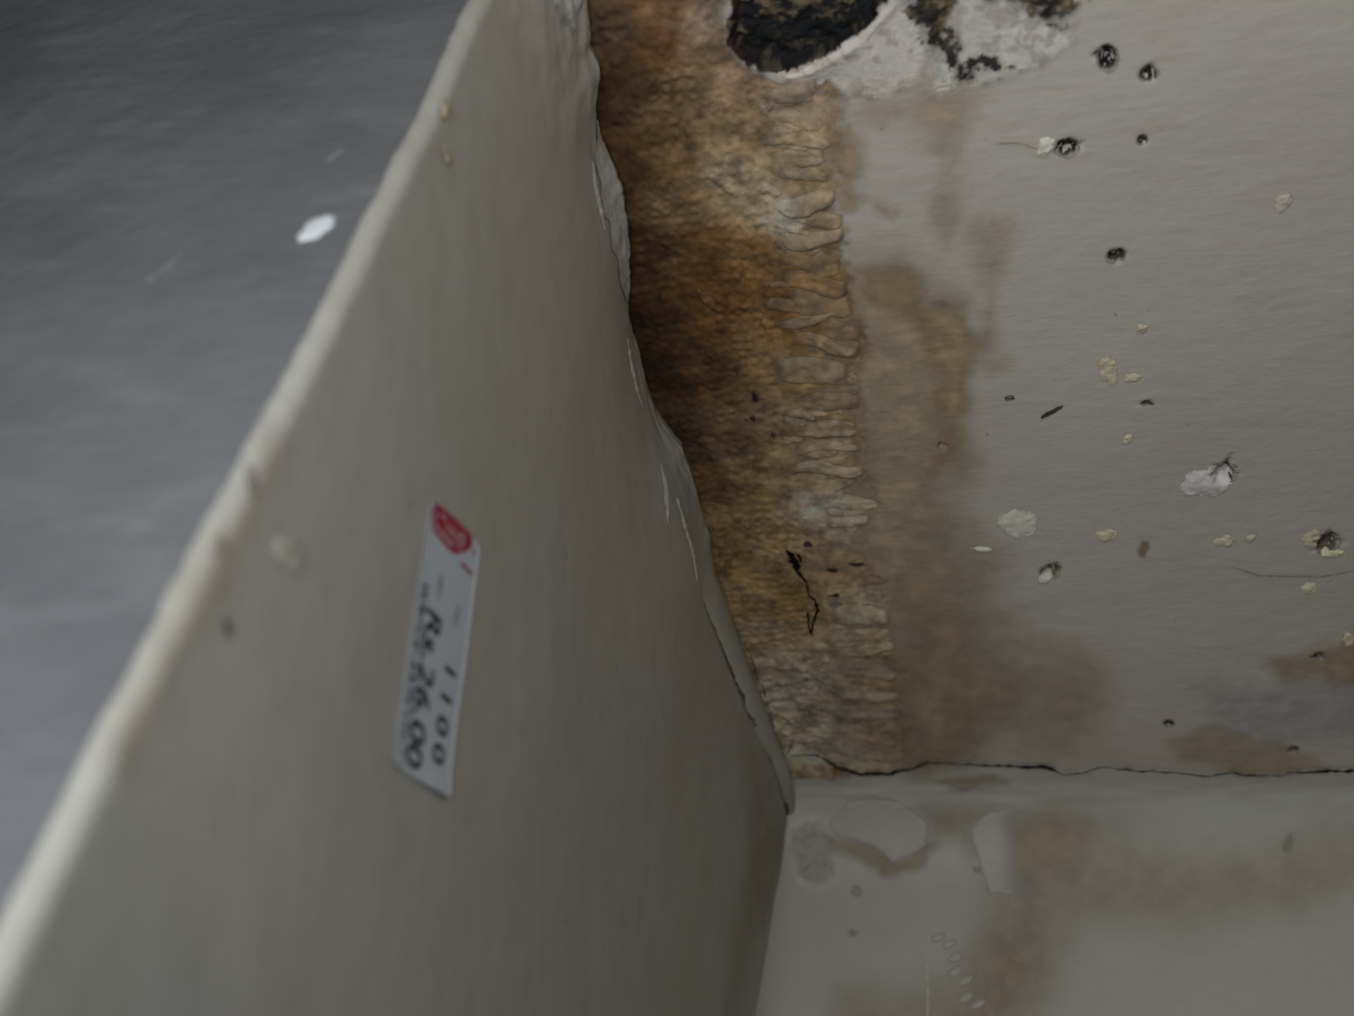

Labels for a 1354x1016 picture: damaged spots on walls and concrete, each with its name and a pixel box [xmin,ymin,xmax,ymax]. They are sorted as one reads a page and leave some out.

peeling [587,0,1080,778]
damp [831,268,1022,770]
peeling [1180,458,1238,497]
crack [786,550,820,636]
crack [705,604,1354,816]
peeling [829,798,928,862]
damp [833,842,930,874]